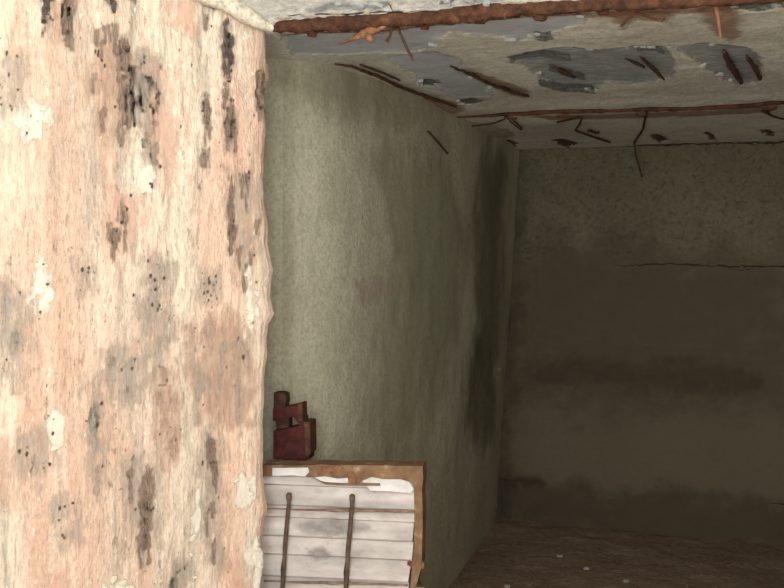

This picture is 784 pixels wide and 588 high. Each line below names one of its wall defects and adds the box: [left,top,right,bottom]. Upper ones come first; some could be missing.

water stain [41,0,76,50]
water stain [94,23,176,168]
water stain [199,8,238,168]
water stain [255,69,265,121]
spalling [273,0,784,105]
spalling [457,101,784,120]
water stain [106,192,136,261]
water stain [225,170,261,292]
crack [616,263,784,271]
water stain [85,254,179,491]
water stain [122,458,159,569]
water stain [194,378,225,566]